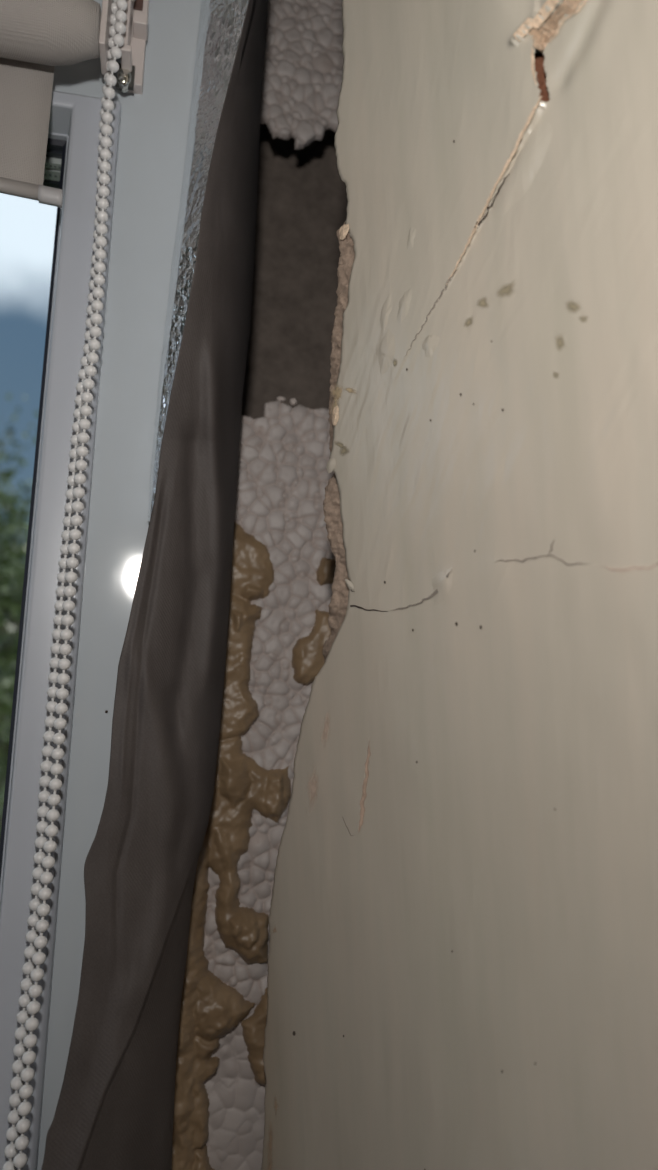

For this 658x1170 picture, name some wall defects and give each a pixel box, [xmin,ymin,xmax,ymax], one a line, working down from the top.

flaking render [513,0,587,55]
crack [409,47,550,350]
flaking render [323,222,355,663]
crack [499,541,583,566]
crack [350,574,449,612]